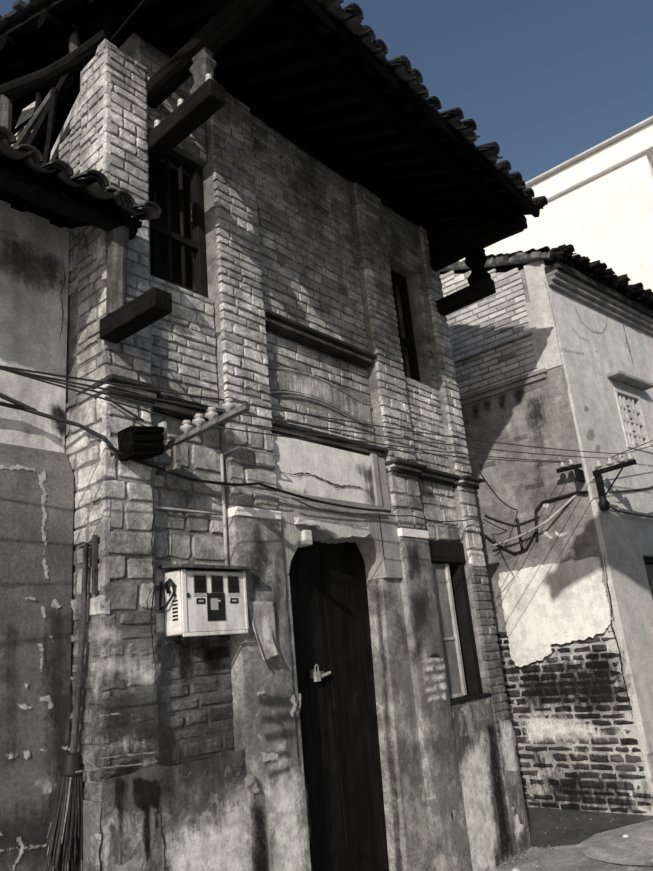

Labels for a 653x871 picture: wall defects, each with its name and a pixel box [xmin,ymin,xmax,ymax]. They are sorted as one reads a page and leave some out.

leakage [0,240,65,288]
leakage [473,389,544,439]
crack [280,471,372,494]
peeling [0,464,49,579]
leakage [409,545,420,576]
peeling [25,596,75,618]
leakage [413,594,428,630]
peeling [17,695,53,710]
leakage [377,588,402,871]
leakage [98,777,160,870]
leakage [165,744,307,871]